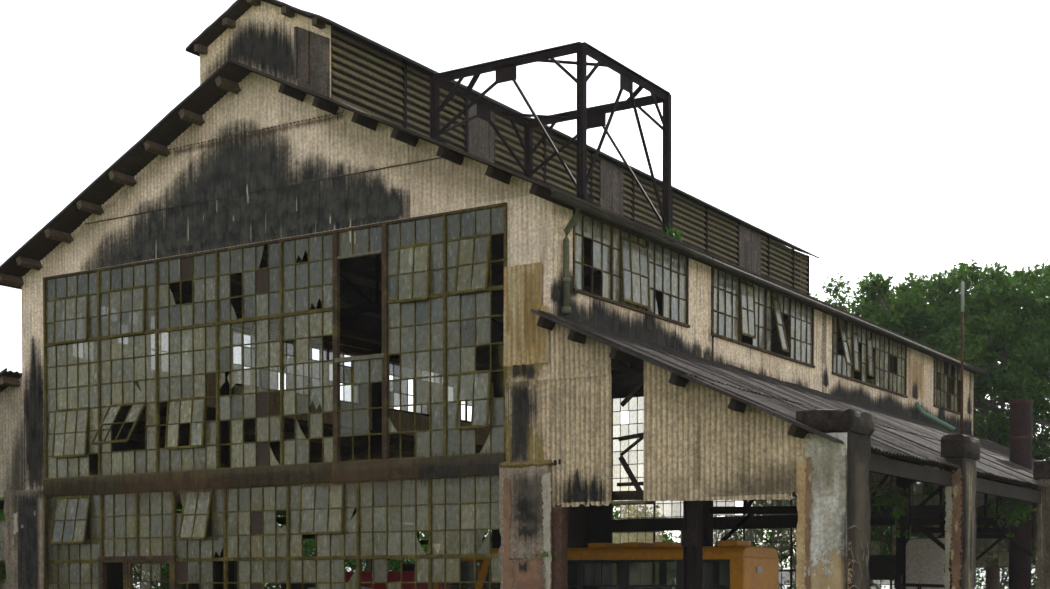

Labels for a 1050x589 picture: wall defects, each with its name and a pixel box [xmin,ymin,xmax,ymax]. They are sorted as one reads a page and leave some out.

damp [206,21,297,85]
damp [85,122,410,270]
damp [7,338,48,589]
damp [419,364,544,541]
flaking render [801,457,853,589]
flaking render [944,465,964,589]